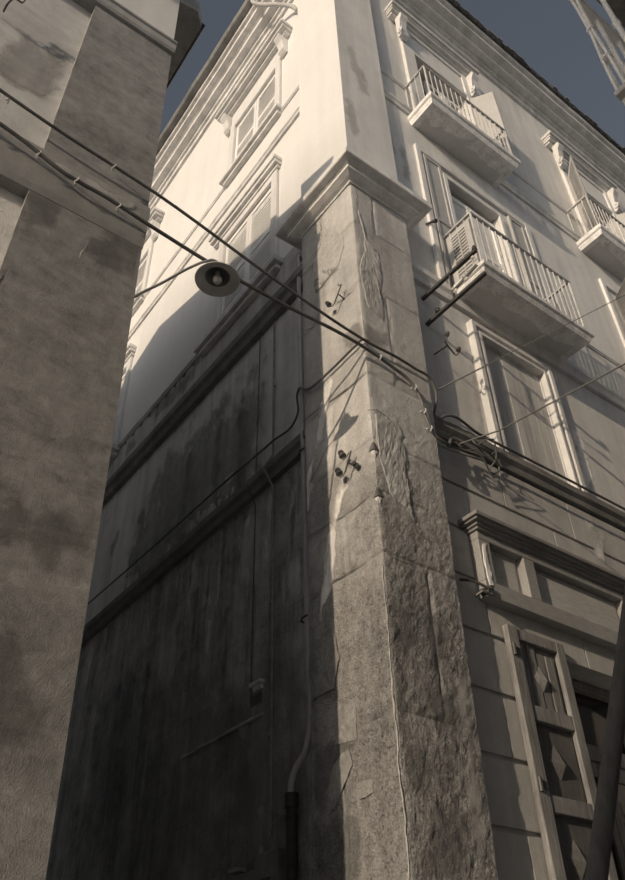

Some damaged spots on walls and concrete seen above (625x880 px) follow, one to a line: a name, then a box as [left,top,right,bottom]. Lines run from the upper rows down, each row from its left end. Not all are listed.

damp [0,34,66,95]
damp [316,378,333,444]
damp [320,466,350,615]